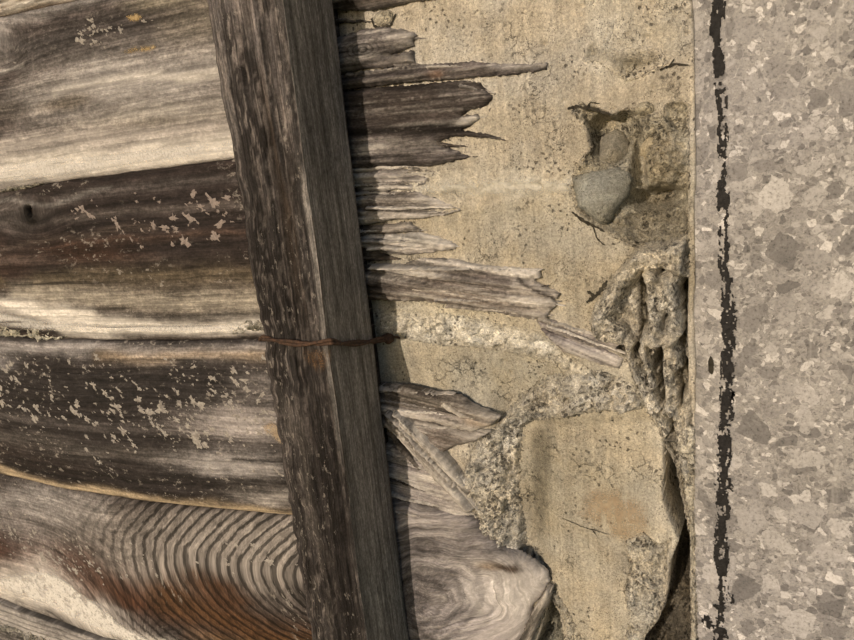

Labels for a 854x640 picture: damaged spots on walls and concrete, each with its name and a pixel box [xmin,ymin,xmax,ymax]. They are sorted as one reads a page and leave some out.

spalling [463,99,699,640]